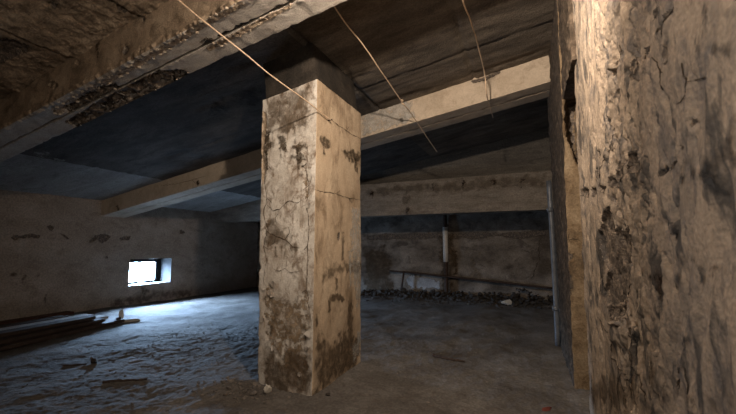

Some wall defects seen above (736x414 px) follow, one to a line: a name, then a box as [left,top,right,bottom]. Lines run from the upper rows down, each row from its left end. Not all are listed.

spalling [53,3,245,128]
spalling [206,3,293,52]
water stain [344,149,361,173]
spalling [564,101,578,164]
crack [677,63,705,104]
crack [263,151,360,325]
water stain [265,240,393,396]
spalling [597,206,632,321]